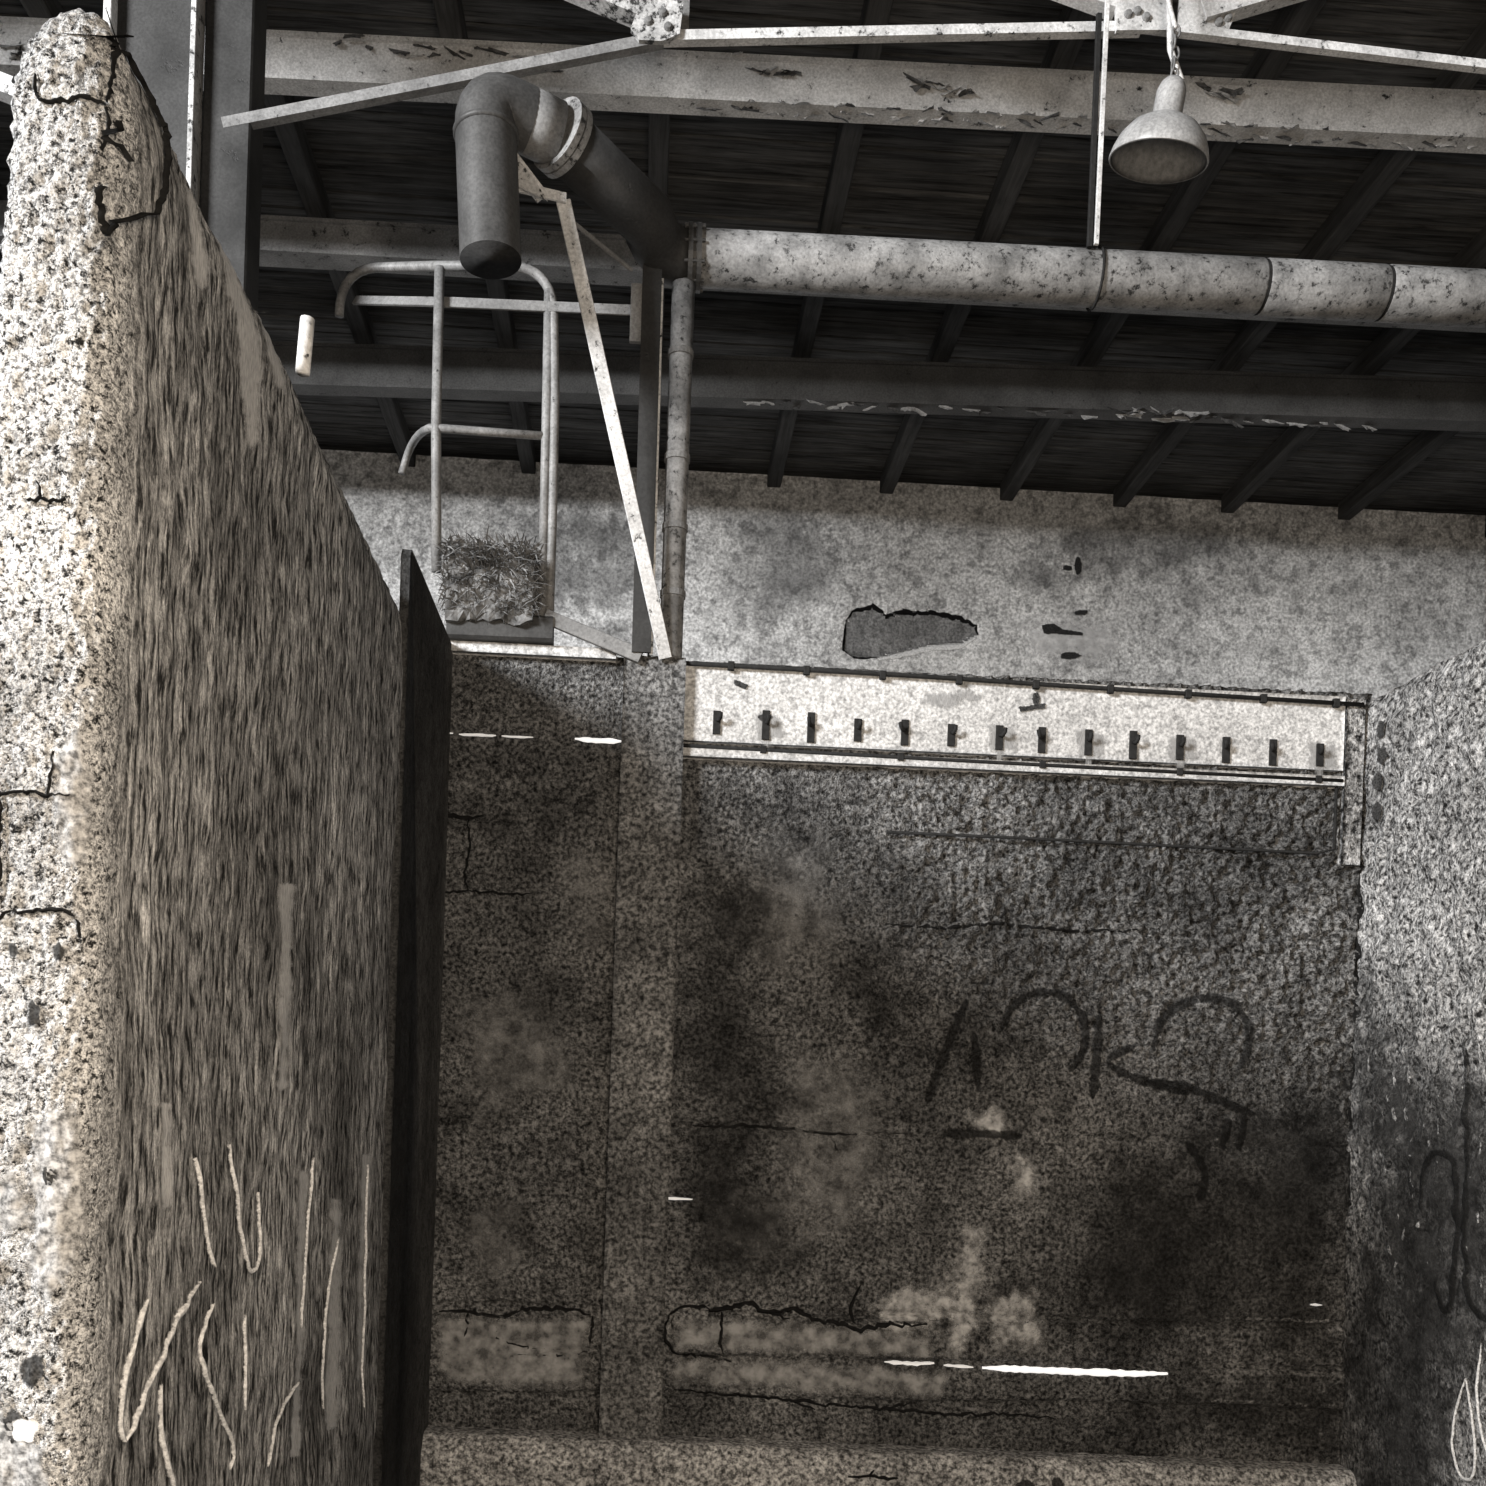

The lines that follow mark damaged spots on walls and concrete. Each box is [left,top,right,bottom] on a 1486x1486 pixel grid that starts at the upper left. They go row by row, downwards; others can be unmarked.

crack [33,9,173,236]
spalling [842,603,979,660]
crack [664,1285,1056,1419]